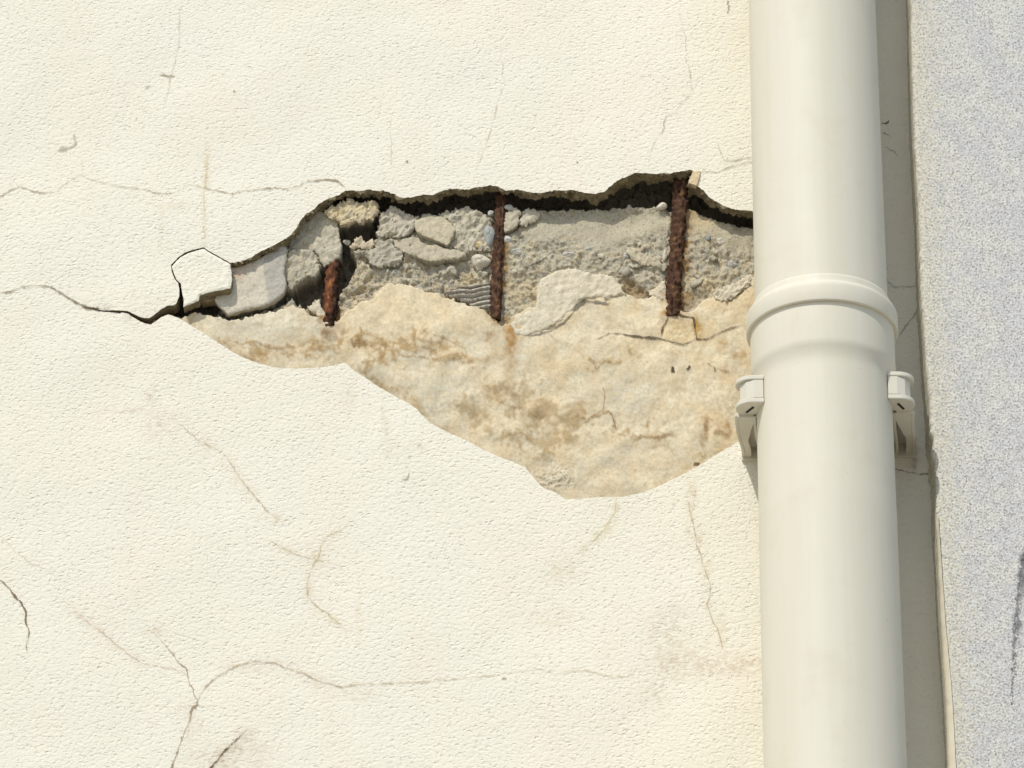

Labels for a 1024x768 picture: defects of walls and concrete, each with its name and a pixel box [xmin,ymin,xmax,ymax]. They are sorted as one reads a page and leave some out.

crack [207,178,344,194]
crack [1,285,99,311]
spalling [92,170,755,499]
crack [2,581,30,649]
crack [169,650,234,768]
crack [210,735,241,768]